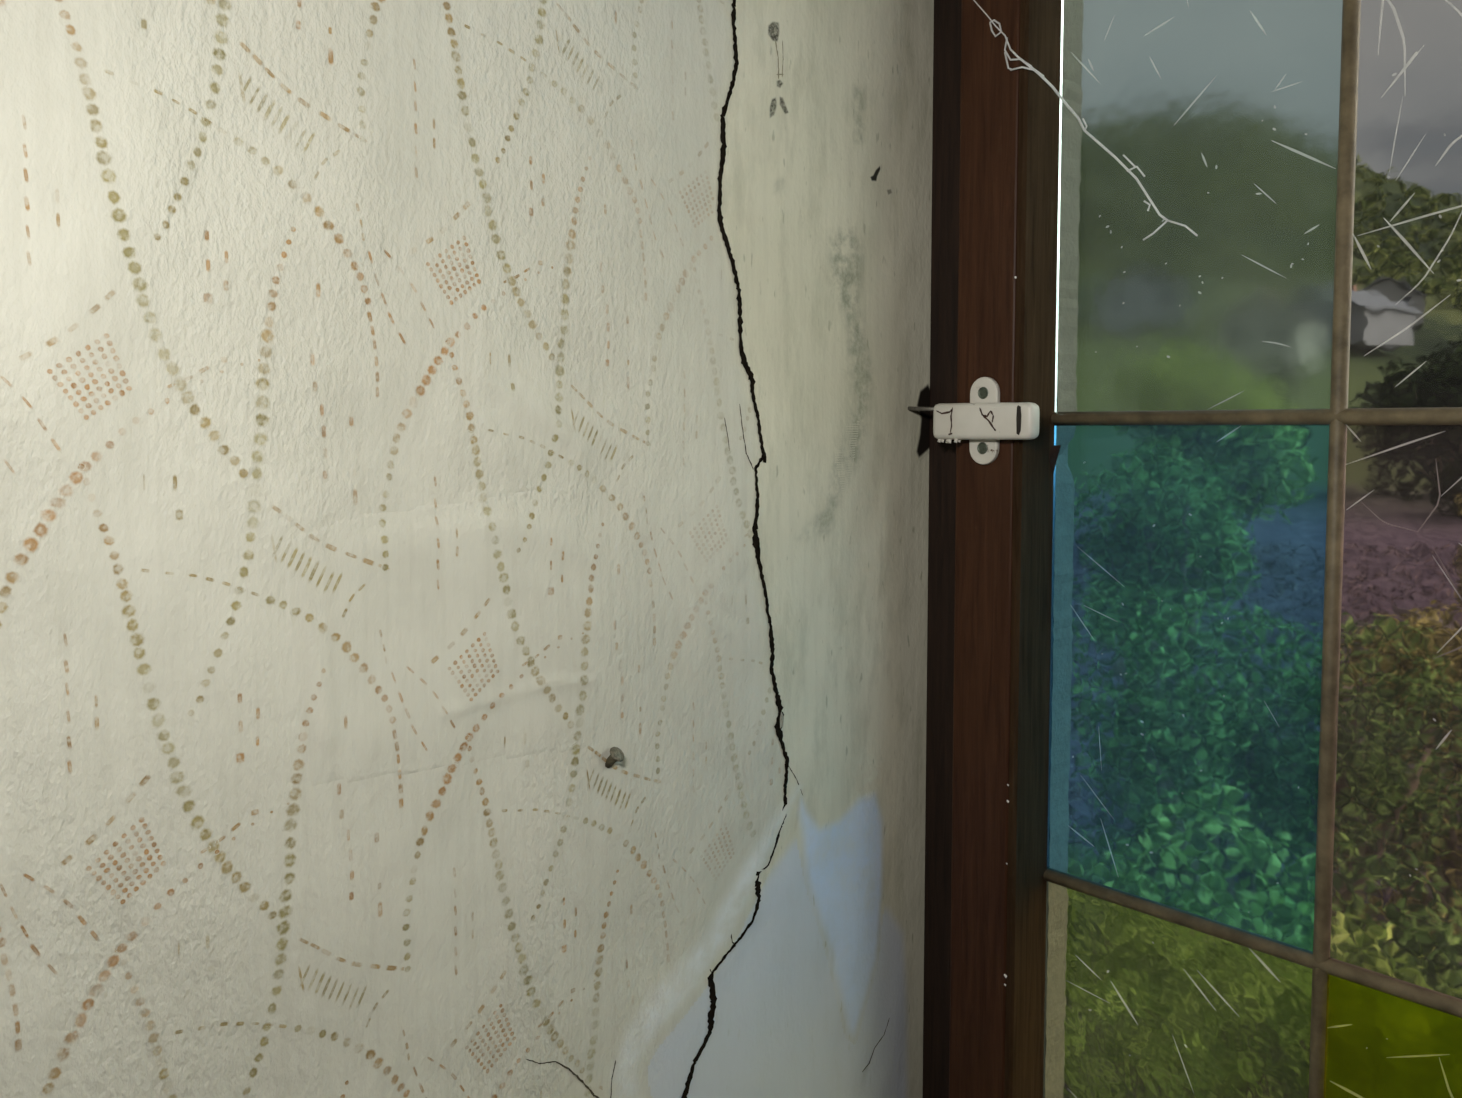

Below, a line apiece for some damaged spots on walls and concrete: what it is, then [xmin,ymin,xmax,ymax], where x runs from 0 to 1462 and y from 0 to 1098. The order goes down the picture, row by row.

crack [681,0,803,1098]